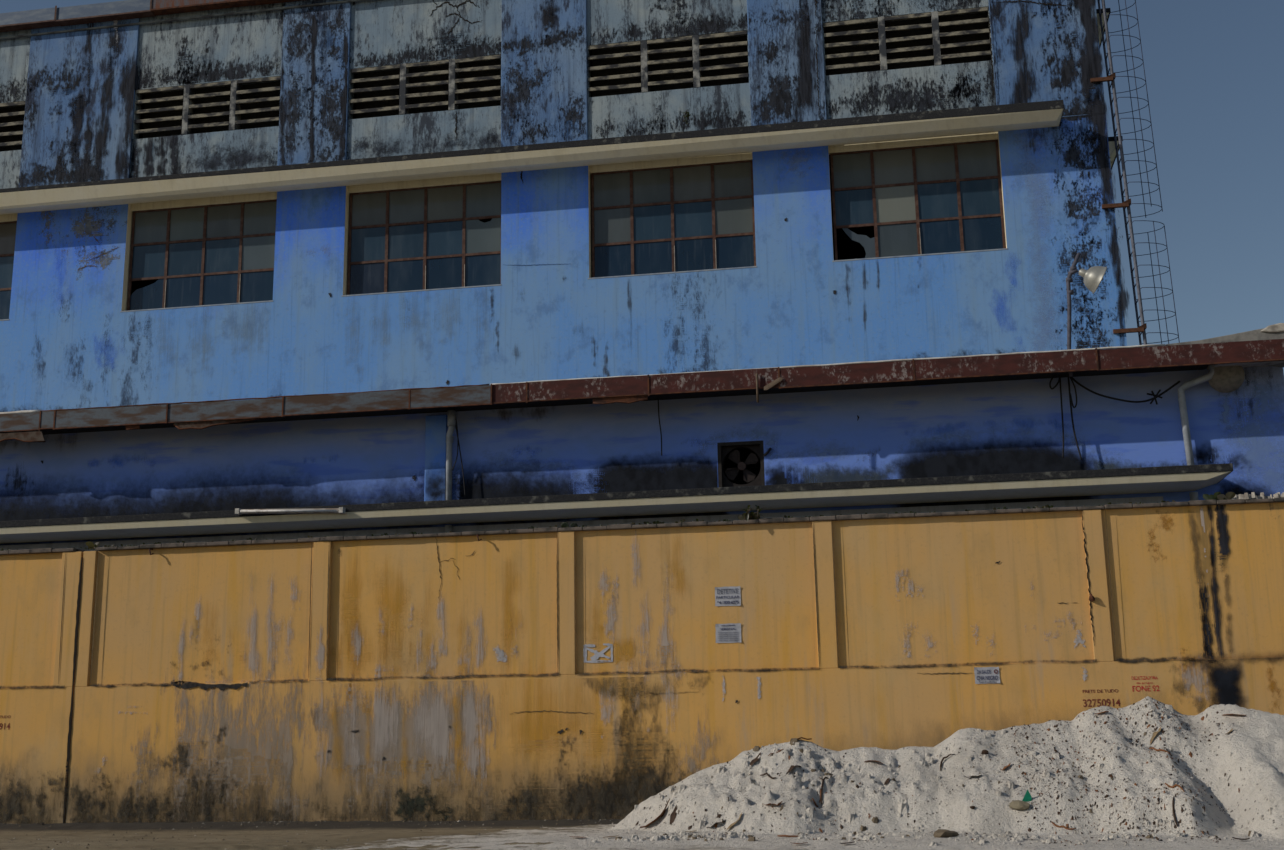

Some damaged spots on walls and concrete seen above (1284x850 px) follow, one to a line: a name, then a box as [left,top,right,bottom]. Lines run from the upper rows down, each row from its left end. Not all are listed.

crack [430,0,482,37]
leakage [0,0,1130,350]
leakage [672,288,715,372]
leakage [0,446,728,521]
leakage [87,528,355,542]
crack [435,537,475,598]
crack [58,552,99,823]
leakage [0,745,237,822]
leakage [559,737,680,818]